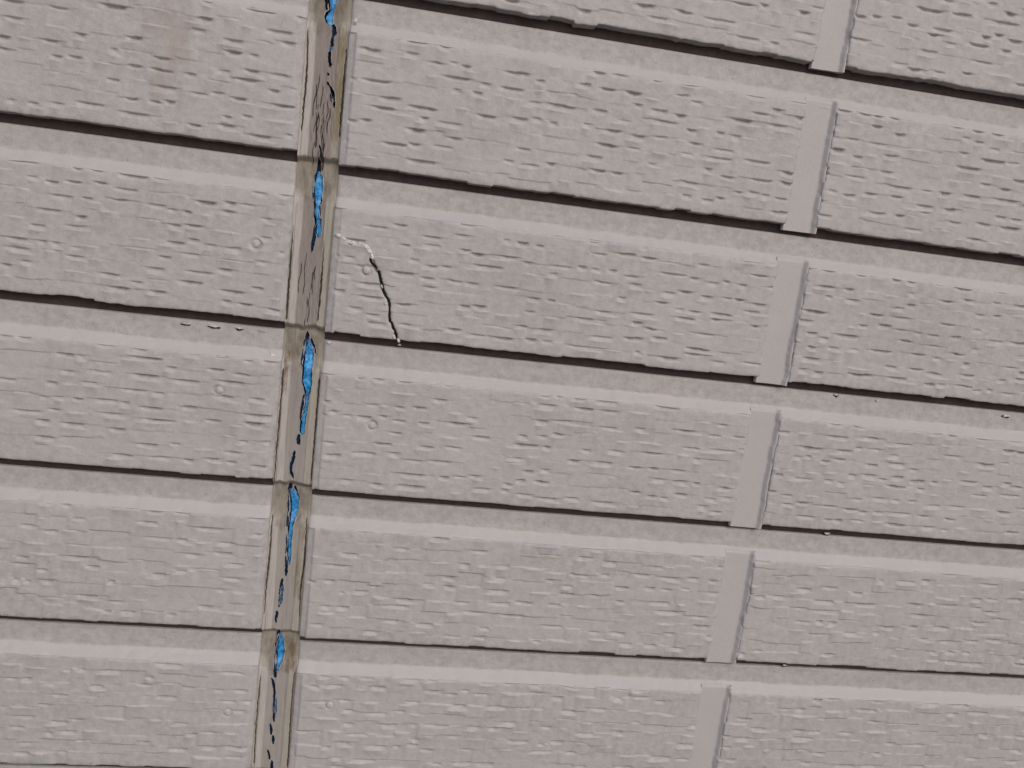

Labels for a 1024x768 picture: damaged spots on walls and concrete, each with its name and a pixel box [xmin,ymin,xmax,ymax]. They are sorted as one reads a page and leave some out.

crack [253,0,400,768]